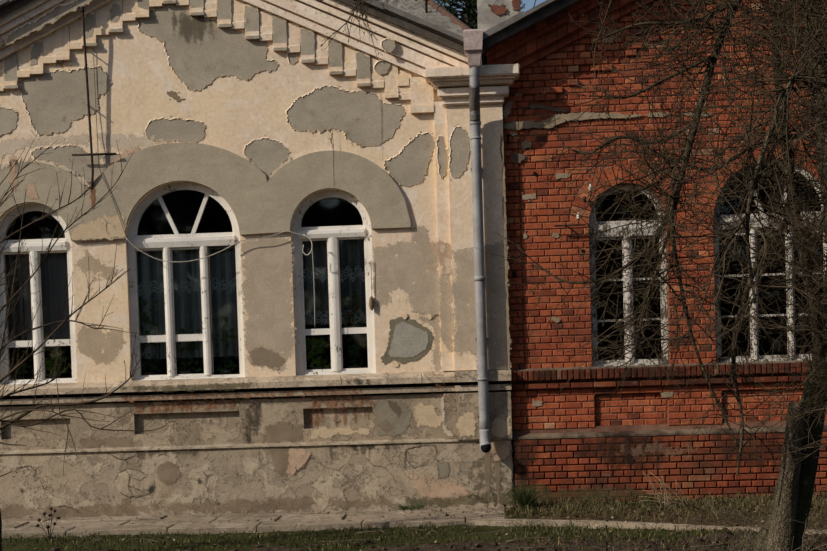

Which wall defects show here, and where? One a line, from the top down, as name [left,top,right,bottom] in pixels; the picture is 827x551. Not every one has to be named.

peeling [0,0,207,192]
peeling [136,0,315,102]
peeling [285,37,406,148]
peeling [488,0,523,15]
peeling [243,135,291,182]
peeling [383,124,471,188]
peeling [240,234,297,374]
peeling [372,226,478,371]
peeling [484,131,532,370]
crack [293,444,447,495]